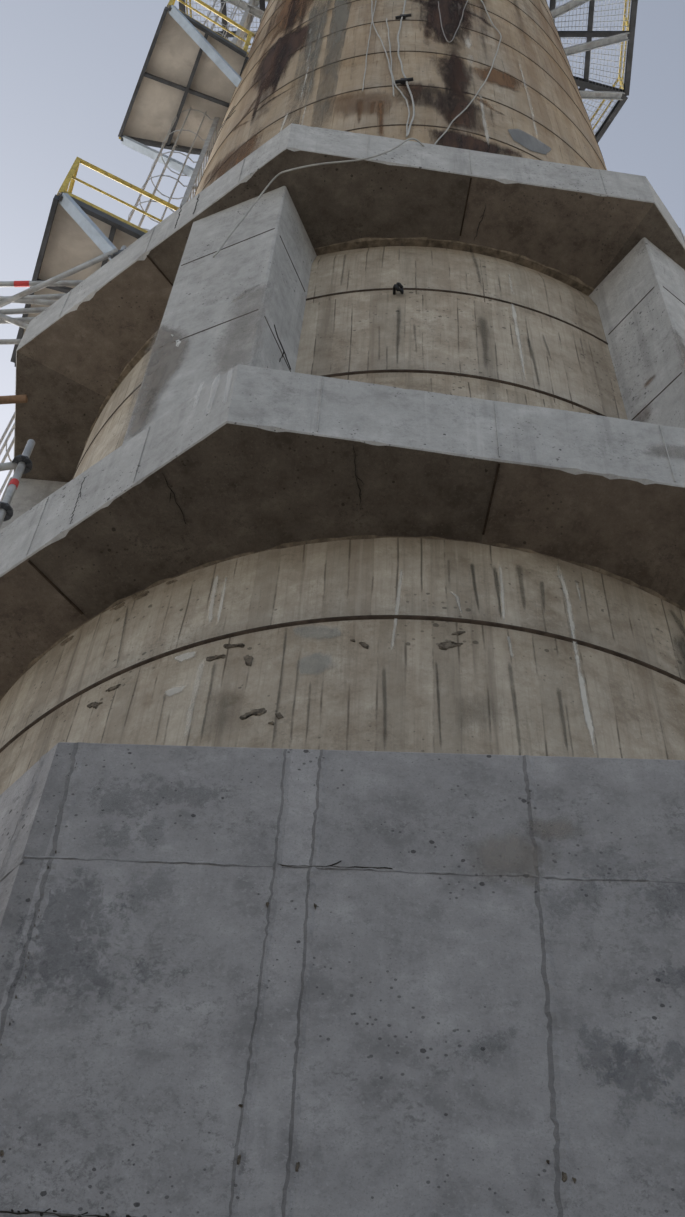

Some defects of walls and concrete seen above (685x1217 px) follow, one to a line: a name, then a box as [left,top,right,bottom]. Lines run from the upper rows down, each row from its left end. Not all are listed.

rust [204,0,313,184]
rust [402,0,521,157]
spalling [239,708,284,725]